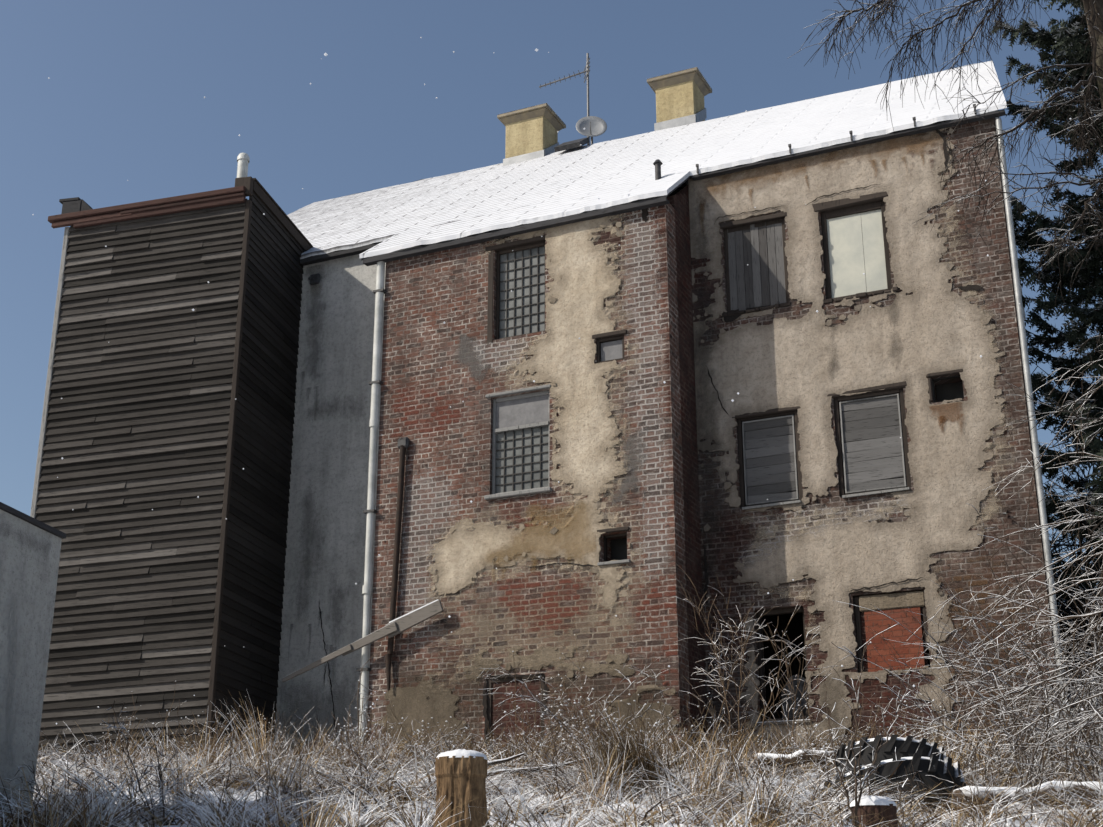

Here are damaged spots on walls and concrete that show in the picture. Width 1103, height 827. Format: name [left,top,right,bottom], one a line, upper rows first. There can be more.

flaking render [372,644,679,762]
flaking render [429,214,644,629]
crack [706,366,731,418]
flaking render [691,257,913,347]
flaking render [698,439,910,756]
flaking render [842,118,1062,761]